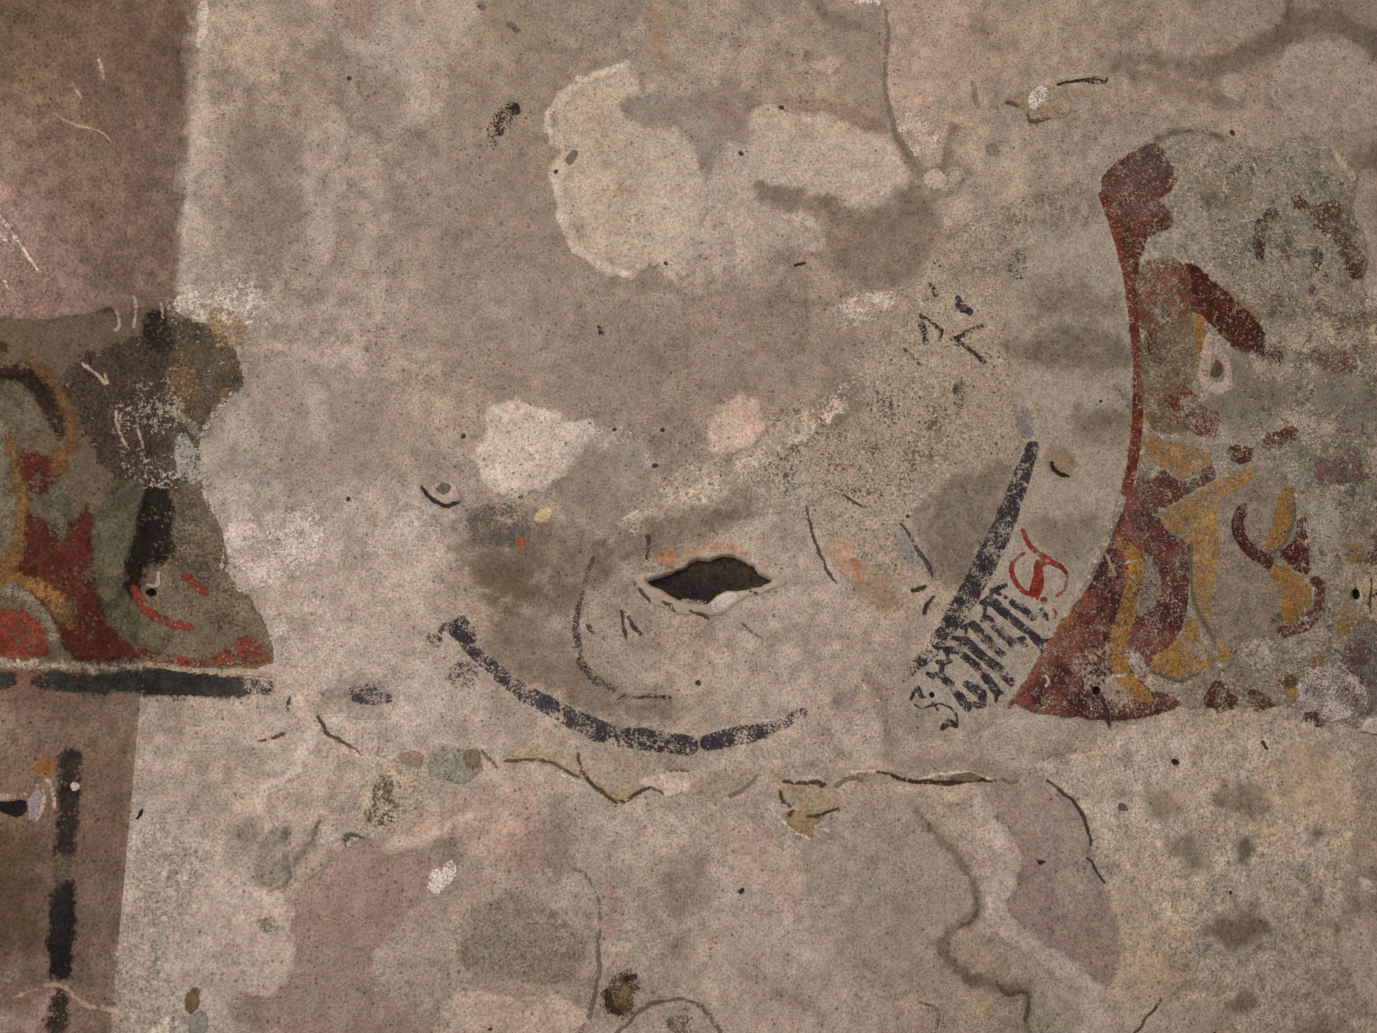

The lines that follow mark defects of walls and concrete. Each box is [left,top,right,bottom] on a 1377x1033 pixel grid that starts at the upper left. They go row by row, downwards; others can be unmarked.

water stain [621,12,979,300]
flaking render [0,205,62,320]
peeling [93,307,121,331]
water stain [169,0,816,676]
flaking render [461,181,1103,619]
flaking render [1352,572,1377,623]
crack [571,867,722,1033]
crack [1133,993,1225,1033]